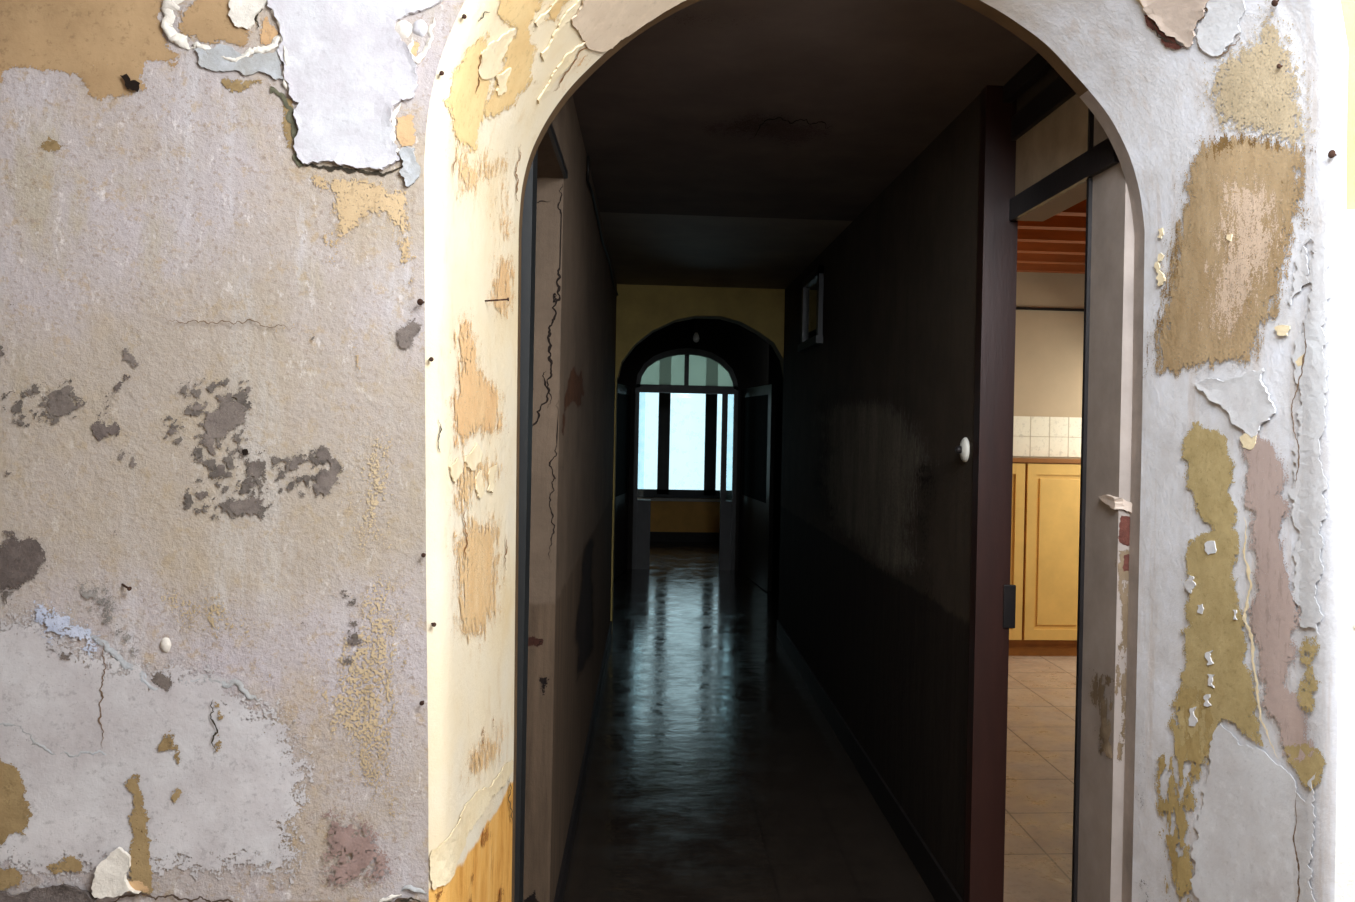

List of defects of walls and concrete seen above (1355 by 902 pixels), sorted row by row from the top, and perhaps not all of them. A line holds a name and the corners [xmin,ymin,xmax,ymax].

peeling [0,0,443,187]
peeling [443,0,686,320]
damp [1,378,87,427]
damp [91,347,139,469]
crack [160,317,295,332]
crack [532,184,563,558]
damp [0,530,48,605]
damp [143,374,421,897]
peeling [0,758,33,845]
peeling [379,718,514,902]
peeling [0,867,25,891]